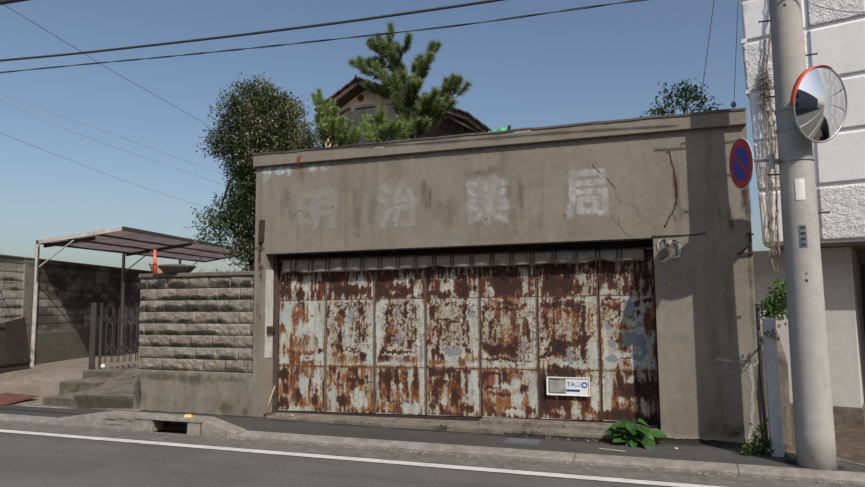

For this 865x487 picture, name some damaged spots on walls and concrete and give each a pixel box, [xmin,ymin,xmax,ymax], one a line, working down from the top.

crack [618,151,705,238]
rust [280,249,655,300]
spalling [657,239,681,263]
rust [278,366,660,423]
crack [715,358,759,440]